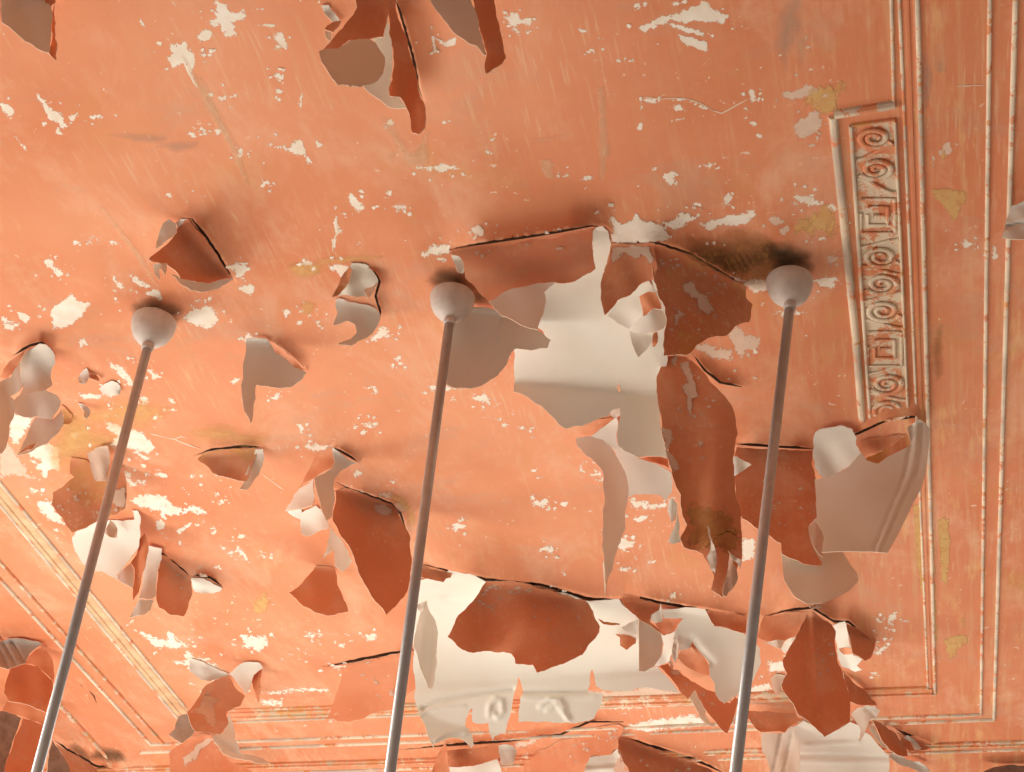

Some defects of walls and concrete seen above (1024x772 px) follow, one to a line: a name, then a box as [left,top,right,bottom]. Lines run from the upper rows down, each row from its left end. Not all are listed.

peeling [0,0,57,61]
peeling [319,0,426,135]
peeling [429,0,538,74]
flaking render [617,0,743,52]
flaking render [652,167,679,186]
leakage [698,240,774,277]
peeling [0,183,931,772]